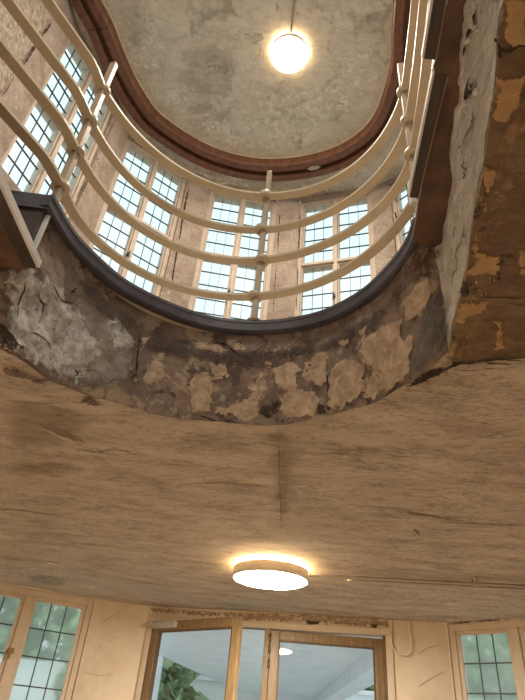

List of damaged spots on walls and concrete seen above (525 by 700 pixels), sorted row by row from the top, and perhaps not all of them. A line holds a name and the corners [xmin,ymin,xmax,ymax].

peeling [504,0,525,49]
spalling [460,78,478,108]
peeling [492,75,525,123]
crack [457,112,474,179]
peeling [454,167,500,325]
efflorescence [4,268,132,385]
peeling [142,352,165,385]
peeling [188,277,431,423]
crack [186,439,288,527]
peeling [151,607,388,628]